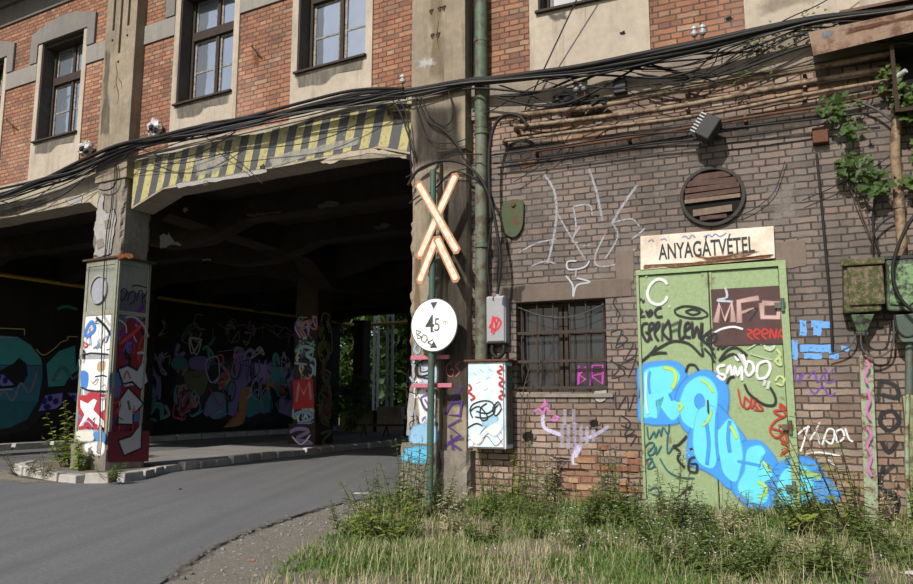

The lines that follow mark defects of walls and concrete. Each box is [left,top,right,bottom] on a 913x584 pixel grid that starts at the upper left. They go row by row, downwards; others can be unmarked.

corrosion [848,14,913,33]
flaking render [93,193,117,257]
peeling [160,233,182,248]
corrosion [644,251,773,269]